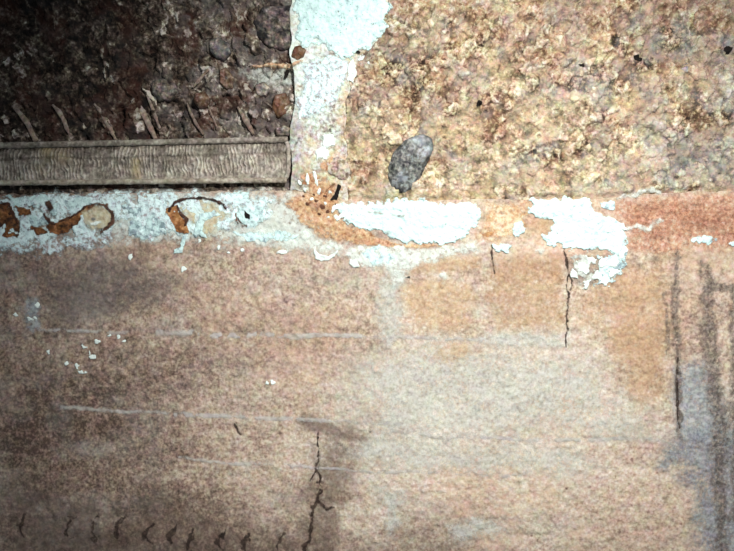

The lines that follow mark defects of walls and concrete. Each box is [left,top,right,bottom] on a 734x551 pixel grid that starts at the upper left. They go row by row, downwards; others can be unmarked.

spalling [0,201,31,238]
spalling [31,202,115,235]
spalling [166,196,227,242]
peeling [331,204,351,221]
corrosion [285,157,447,249]
flaking render [528,195,628,289]
crack [564,251,573,347]
crack [674,357,682,429]
damp [657,253,734,551]
crack [302,433,333,551]